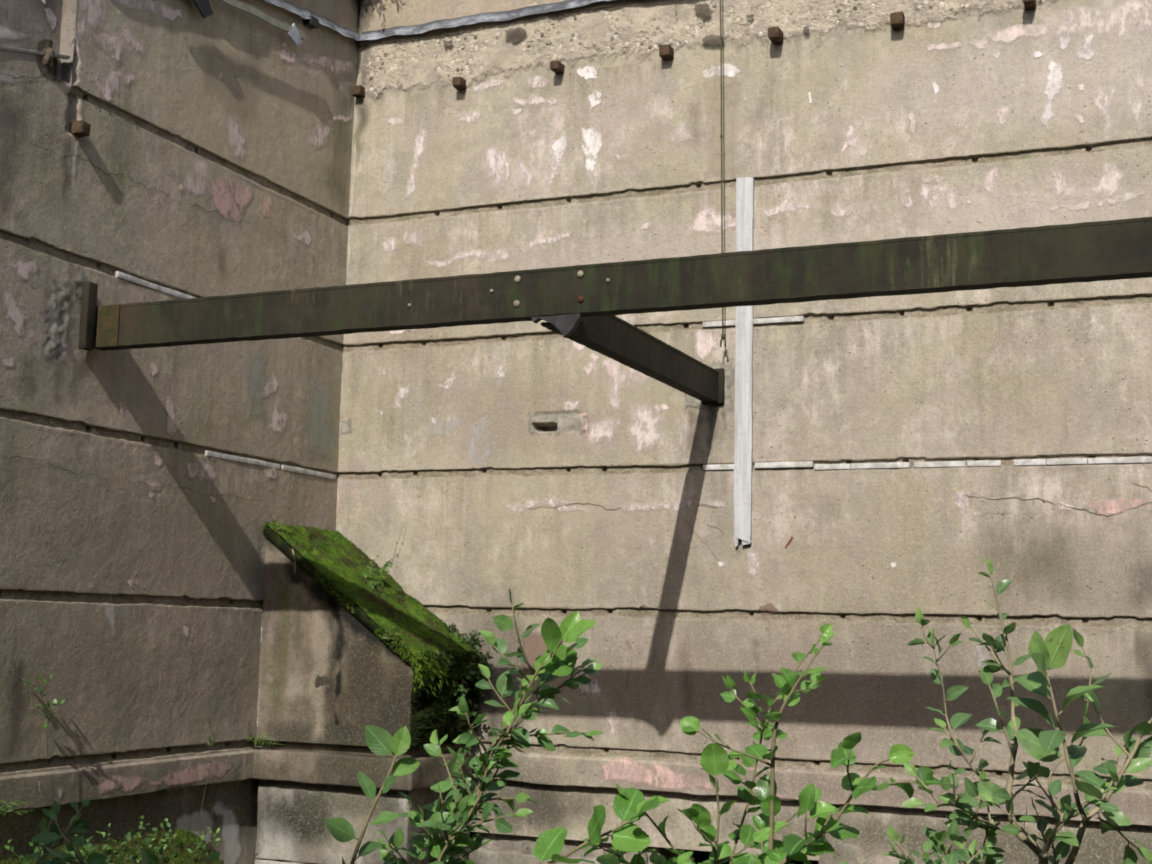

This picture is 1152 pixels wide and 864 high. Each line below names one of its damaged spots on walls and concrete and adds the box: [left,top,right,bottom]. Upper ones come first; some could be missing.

spalling [278,0,1052,115]
peeling [1058,0,1152,60]
peeling [1033,51,1063,129]
peeling [1078,84,1115,129]
peeling [484,133,567,189]
peeling [581,127,602,183]
crack [29,142,356,277]
peeling [179,159,273,220]
peeling [9,260,38,279]
peeling [3,291,25,336]
crack [947,482,1152,517]
peeling [1090,498,1143,514]